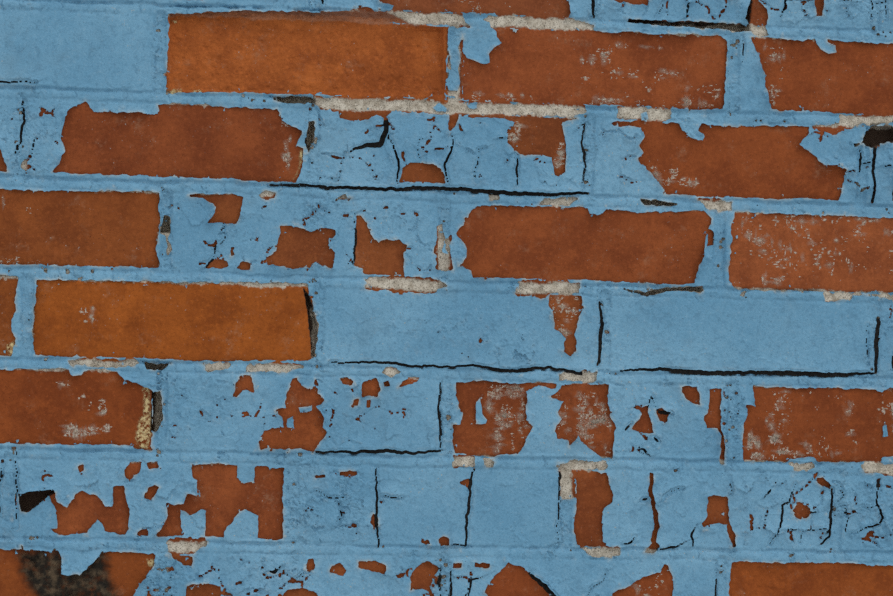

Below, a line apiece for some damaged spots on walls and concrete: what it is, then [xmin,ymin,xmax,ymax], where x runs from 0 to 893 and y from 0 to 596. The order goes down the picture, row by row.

spalling [152,0,893,364]
peeling [0,97,333,571]
peeling [336,364,427,414]
peeling [628,401,675,440]
peeling [309,465,364,486]
peeling [445,365,628,565]
peeling [364,507,385,533]
peeling [606,466,681,596]
peeling [0,542,161,596]
peeling [179,578,229,596]
peeling [263,552,393,596]
peeling [404,529,560,596]